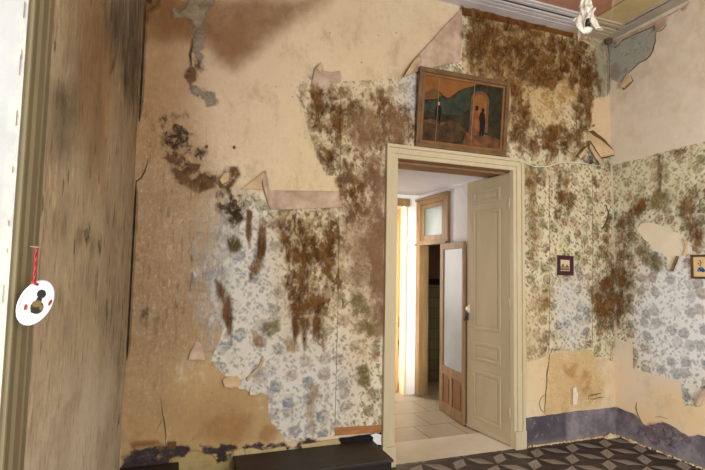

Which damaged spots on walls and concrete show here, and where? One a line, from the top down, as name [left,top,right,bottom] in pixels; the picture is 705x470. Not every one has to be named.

spalling [172,0,218,106]
leakage [104,0,293,112]
leakage [161,118,205,169]
leakage [217,189,245,225]
leakage [227,235,242,252]
leakage [631,232,662,271]
flaking render [638,222,688,271]
leakage [351,296,373,335]
leakage [358,364,373,396]